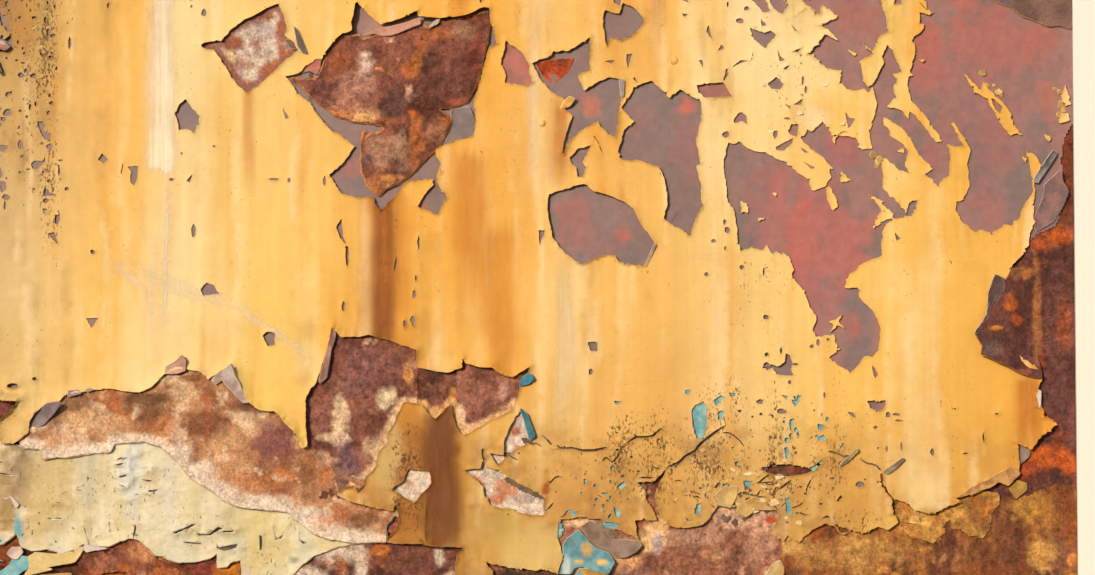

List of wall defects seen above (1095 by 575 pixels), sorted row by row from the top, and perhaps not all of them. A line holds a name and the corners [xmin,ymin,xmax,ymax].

peeling [0,15,44,79]
peeling [32,16,71,58]
peeling [0,122,53,169]
peeling [38,160,62,244]
peeling [198,0,1073,378]
corrosion [0,202,535,575]
peeling [389,464,431,508]
peeling [459,404,680,538]
peeling [685,348,844,527]
corrosion [482,124,1077,575]
peeling [848,395,903,429]